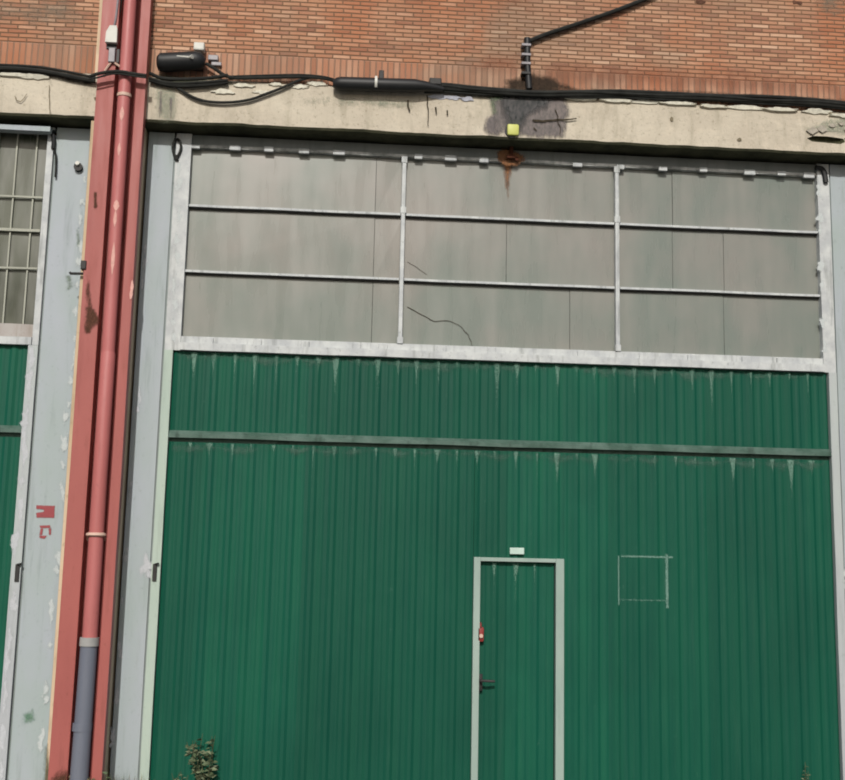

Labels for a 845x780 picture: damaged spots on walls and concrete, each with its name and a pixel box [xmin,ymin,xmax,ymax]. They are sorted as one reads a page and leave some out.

water stain [484,96,569,138]
peeling [565,98,845,144]